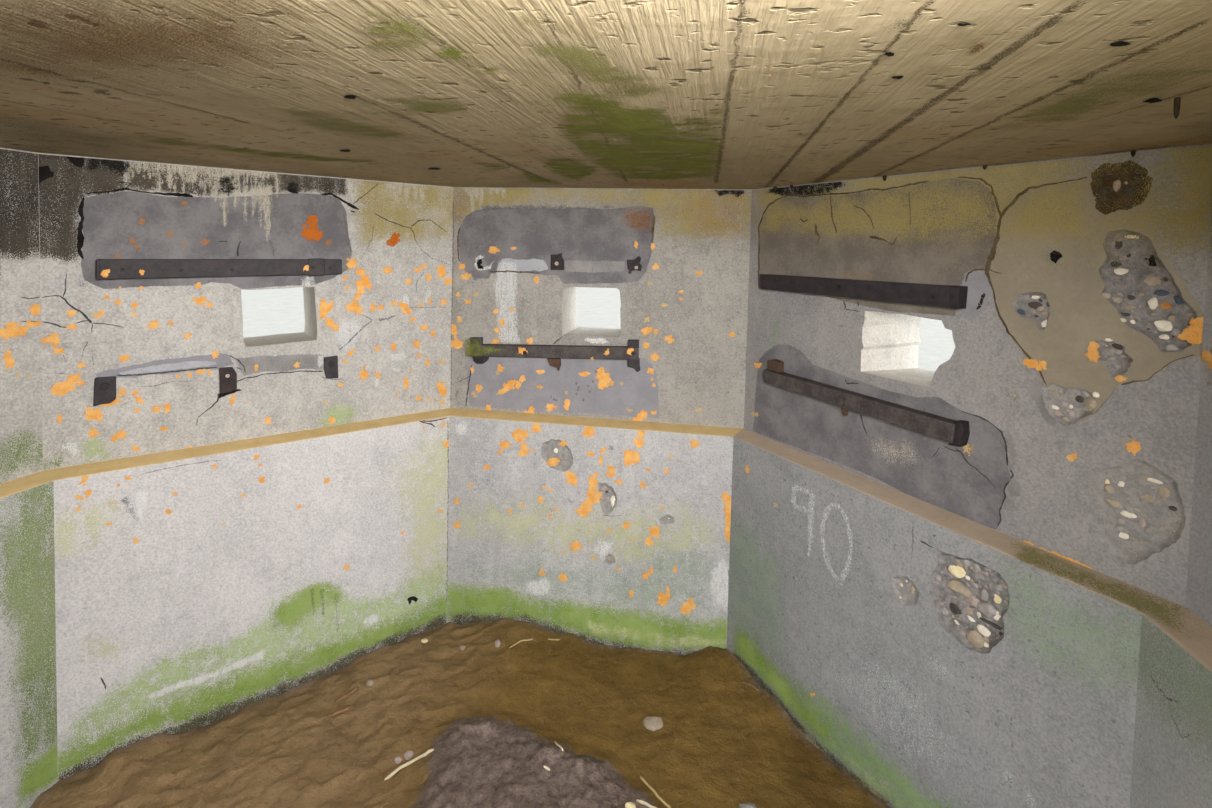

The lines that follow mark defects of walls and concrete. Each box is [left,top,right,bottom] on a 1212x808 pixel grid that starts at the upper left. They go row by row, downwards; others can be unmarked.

water stain [0,112,1212,273]
spalling [1090,160,1153,215]
crack [489,268,538,276]
spalling [1098,229,1198,353]
crack [22,182,472,606]
spalling [541,439,573,472]
spalling [1093,338,1133,378]
spalling [1078,459,1186,564]
spalling [889,548,1009,654]
water stain [58,611,702,781]
water stain [732,648,895,808]
water stain [819,649,977,777]